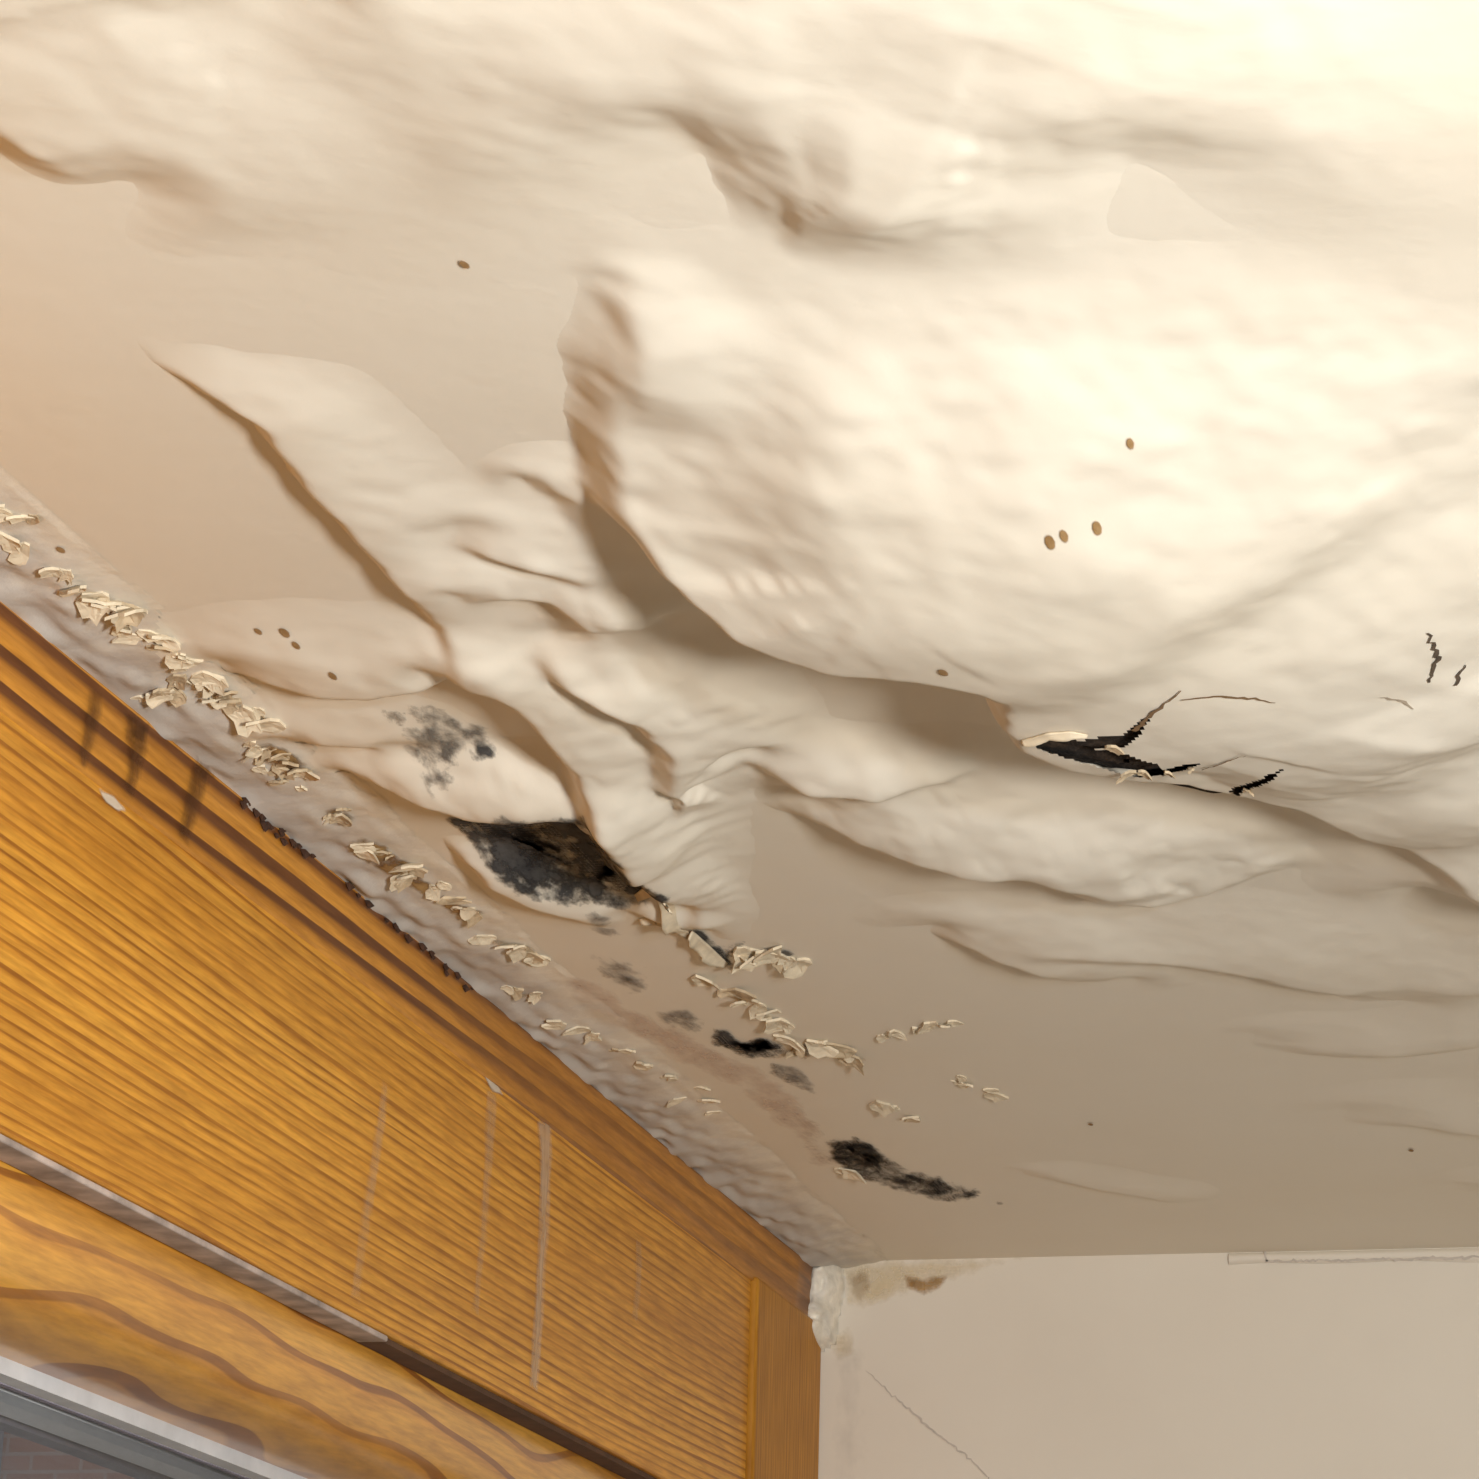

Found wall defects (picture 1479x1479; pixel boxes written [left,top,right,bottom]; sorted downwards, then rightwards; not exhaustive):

crack [1383,633,1466,709]
damp [414,715,494,782]
peeling [323,808,551,967]
peeling [834,1167,866,1184]